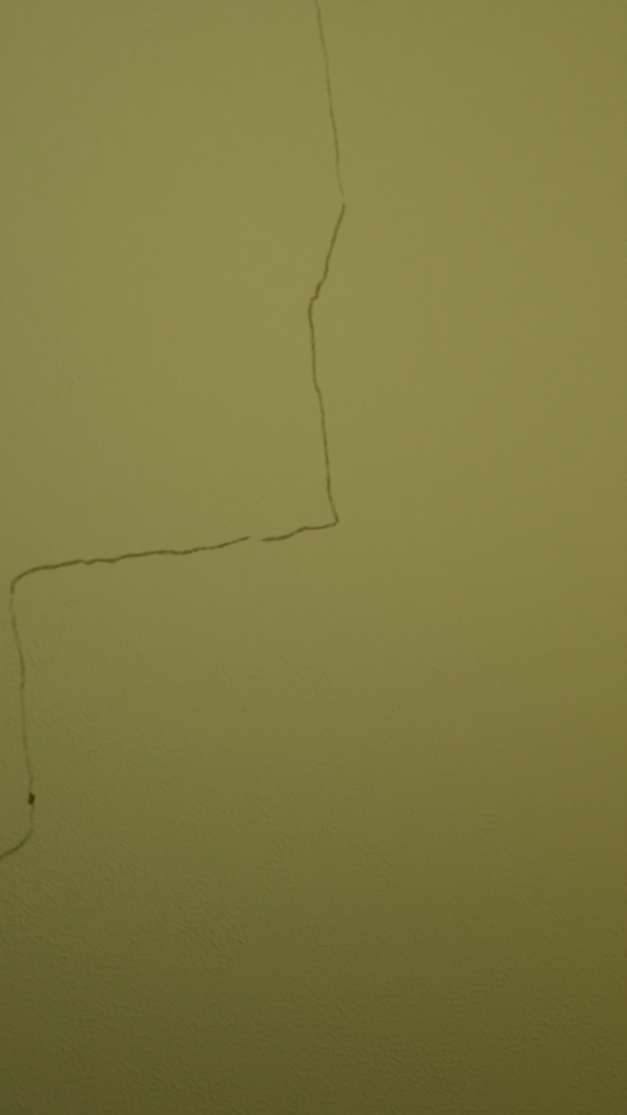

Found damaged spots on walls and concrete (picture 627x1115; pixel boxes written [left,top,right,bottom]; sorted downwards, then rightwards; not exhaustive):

crack [12,517,337,589]